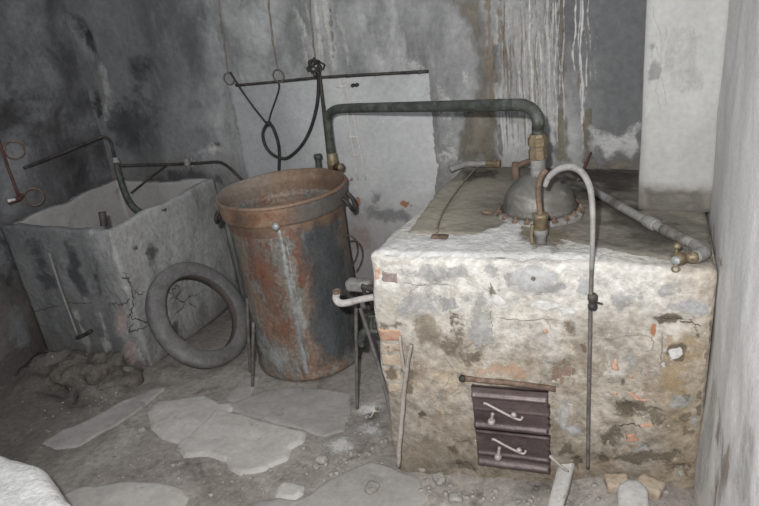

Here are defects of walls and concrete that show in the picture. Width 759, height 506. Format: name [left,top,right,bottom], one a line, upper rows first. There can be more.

water stain [406,60,434,70]
water stain [453,0,637,190]
water stain [439,111,504,162]
peeling [588,122,640,158]
water stain [68,253,86,292]
crack [168,284,204,314]
peeling [661,347,683,367]